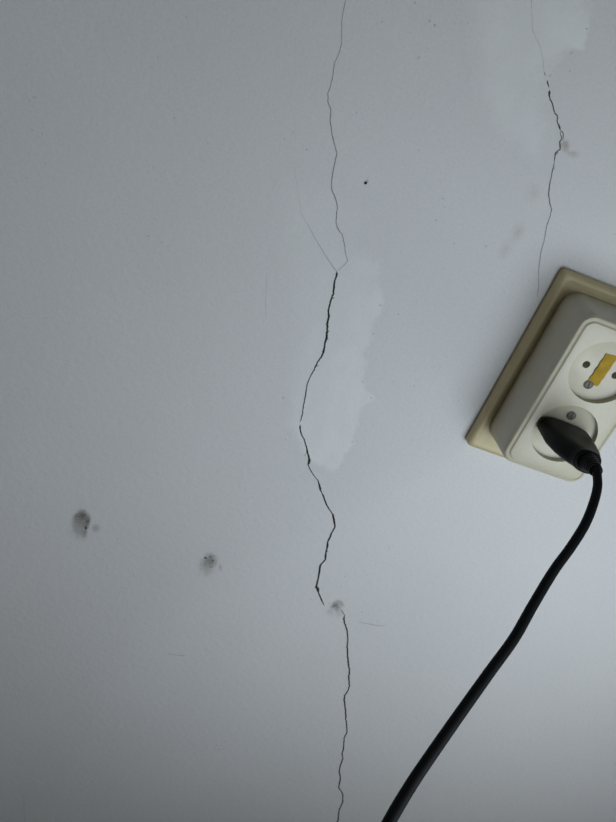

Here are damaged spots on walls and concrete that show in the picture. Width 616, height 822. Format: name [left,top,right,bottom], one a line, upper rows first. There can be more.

crack [299,4,350,822]
crack [537,72,564,297]